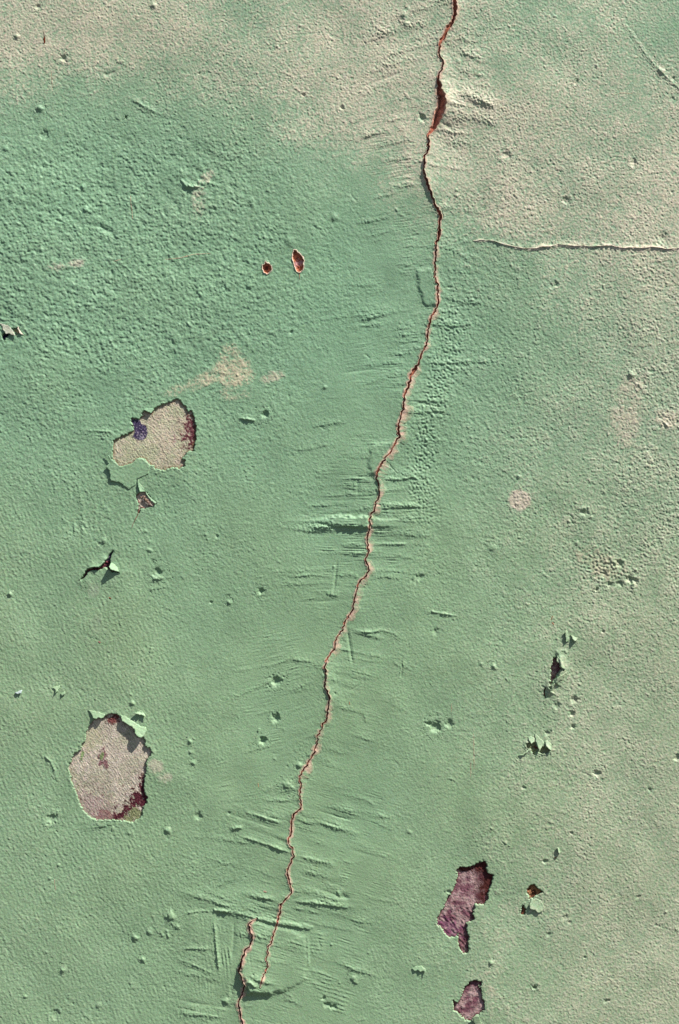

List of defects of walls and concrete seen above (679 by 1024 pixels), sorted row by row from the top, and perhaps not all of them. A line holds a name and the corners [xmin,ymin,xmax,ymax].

spalling [261,261,272,275]
hole [291,249,305,279]
crack [473,238,679,253]
peeling [106,399,197,526]
crack [235,0,462,1024]
peeling [544,655,566,698]
peeling [69,710,152,822]
peeling [437,861,493,953]
peeling [521,884,545,915]
peeling [453,980,485,1024]